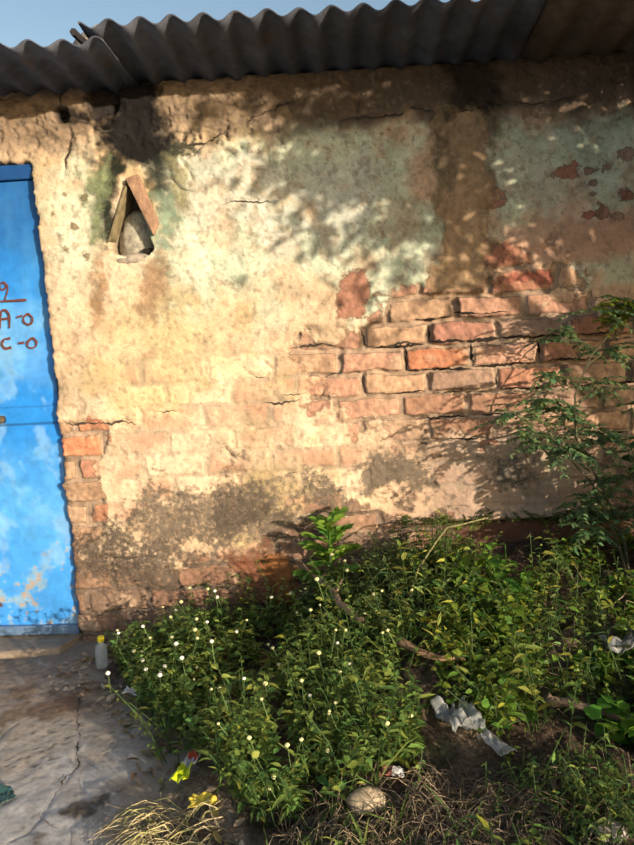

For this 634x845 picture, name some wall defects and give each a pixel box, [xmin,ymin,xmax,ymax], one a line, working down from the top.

crack [339,88,474,122]
water stain [93,157,127,240]
water stain [145,133,200,208]
crack [222,198,270,206]
water stain [426,61,502,297]
peeling [551,160,625,221]
peeling [610,187,634,202]
peeling [617,146,634,162]
flaking render [284,238,634,460]
water stain [348,435,440,512]
water stain [74,450,344,607]
crack [0,691,81,845]